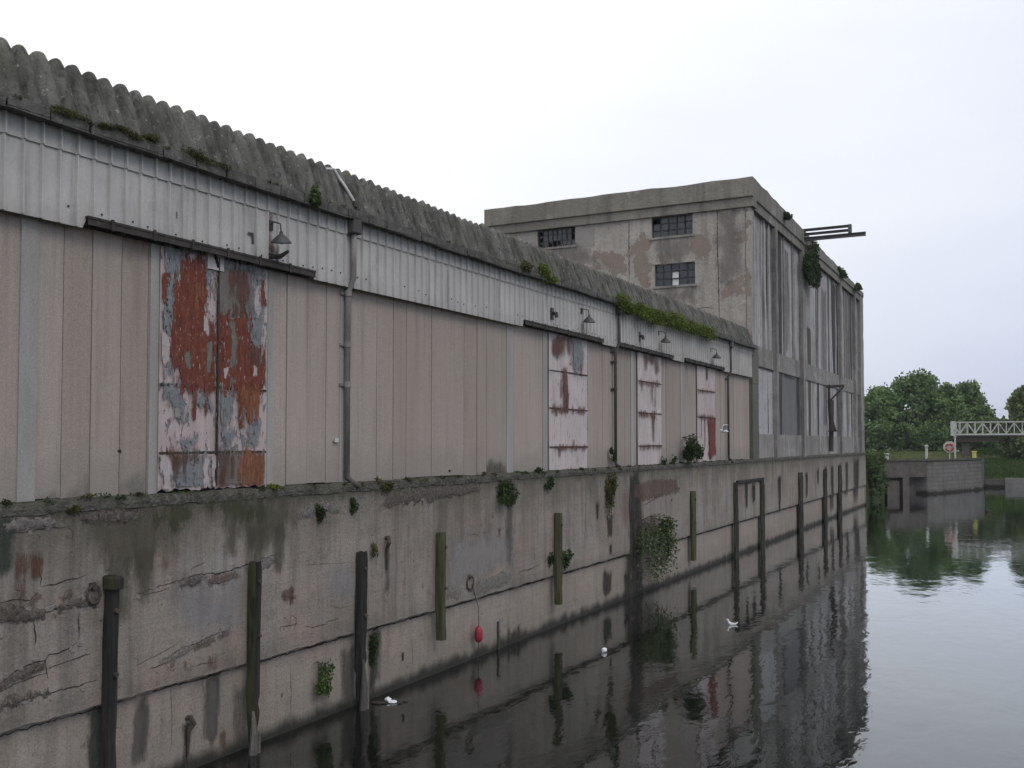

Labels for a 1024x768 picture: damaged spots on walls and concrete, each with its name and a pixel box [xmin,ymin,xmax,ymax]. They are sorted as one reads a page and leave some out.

rust [169,448,198,479]
peeling [160,243,267,489]
rust [169,251,266,429]
rust [219,446,265,487]
rust [552,335,585,416]
rust [639,354,661,450]
rust [700,414,716,459]
damp [275,526,283,570]
crack [675,491,845,542]
crack [0,548,648,745]